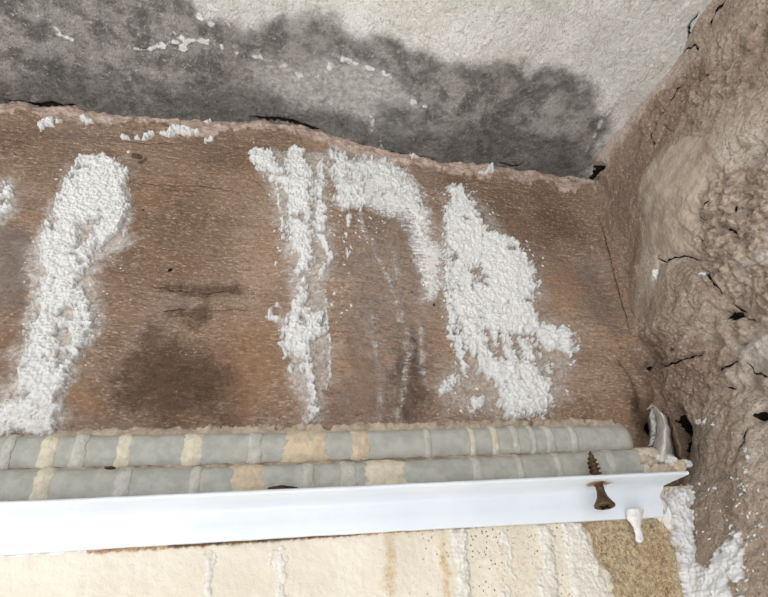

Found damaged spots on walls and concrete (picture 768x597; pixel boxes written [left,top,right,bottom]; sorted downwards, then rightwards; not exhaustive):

crack [682,3,724,55]
water stain [0,0,613,500]
crack [658,239,757,322]
crack [647,355,702,371]
crack [721,361,768,390]
crack [675,415,693,453]
crack [735,412,768,459]